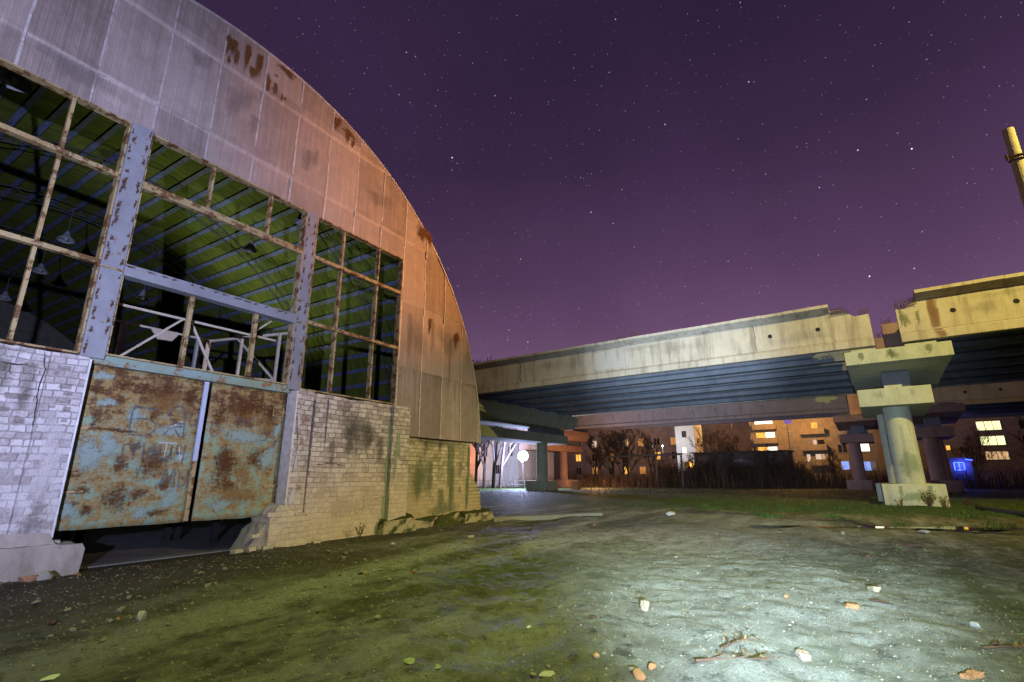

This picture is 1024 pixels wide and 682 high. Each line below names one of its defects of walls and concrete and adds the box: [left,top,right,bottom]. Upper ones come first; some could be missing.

corrosion [226,35,295,100]
corrosion [83,130,152,356]
corrosion [418,226,432,245]
corrosion [927,300,946,337]
crack [0,351,46,433]
corrosion [117,377,198,419]
corrosion [90,387,170,511]
corrosion [211,445,261,502]
leakage [416,445,453,510]